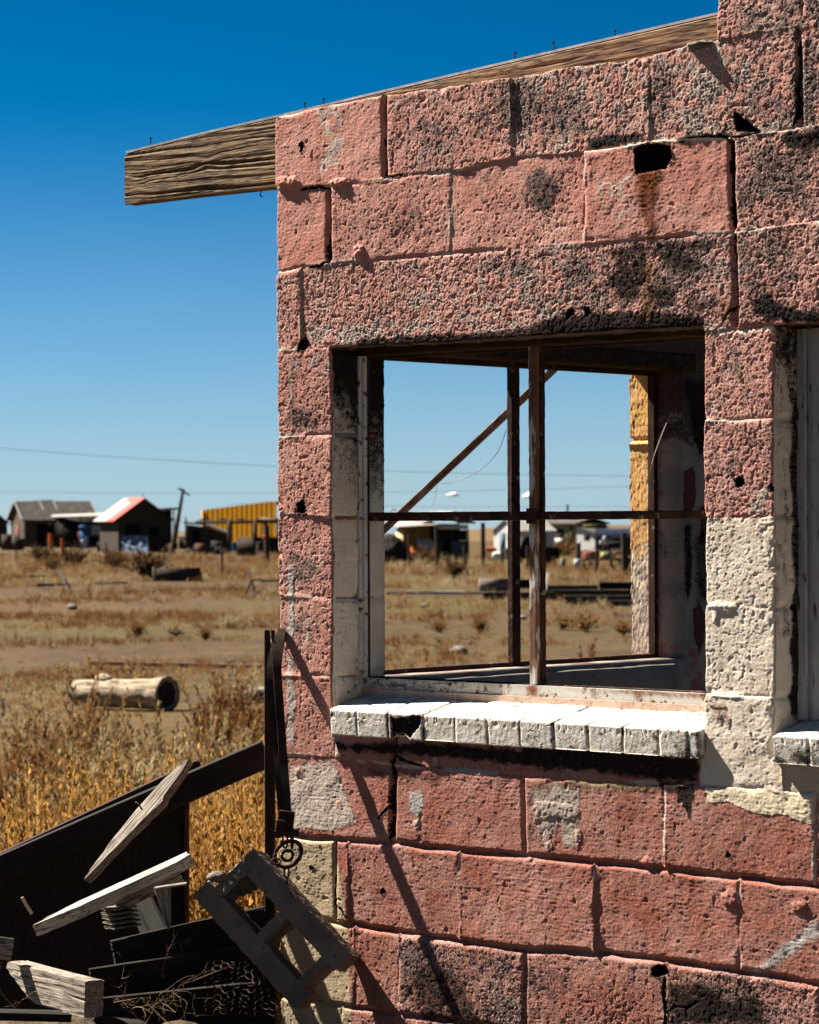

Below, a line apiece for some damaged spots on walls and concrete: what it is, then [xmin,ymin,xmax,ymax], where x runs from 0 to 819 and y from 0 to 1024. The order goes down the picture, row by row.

corrosion [634,170,661,247]
spalling [390,715,421,739]
peeling [289,760,356,831]
crack [377,738,425,841]
peeling [408,791,425,829]
peeling [529,779,581,850]